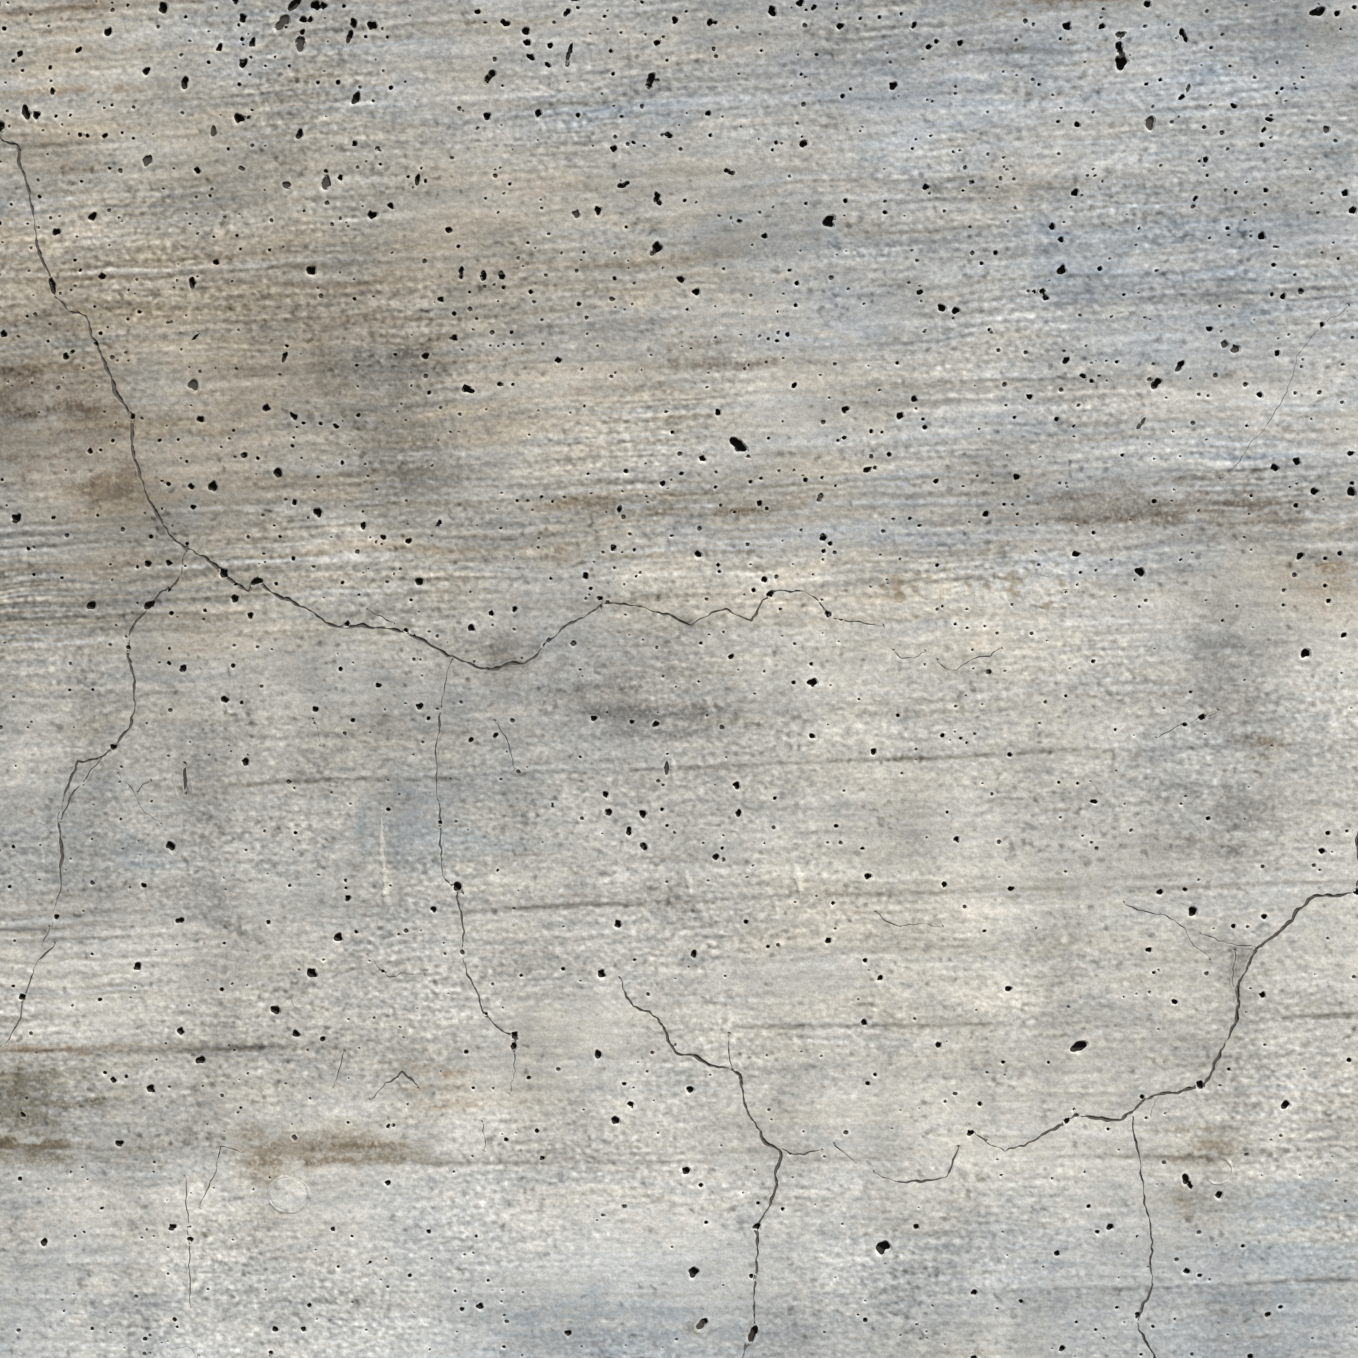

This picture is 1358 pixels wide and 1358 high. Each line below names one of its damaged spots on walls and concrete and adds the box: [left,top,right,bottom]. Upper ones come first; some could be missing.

crack [0,132,1002,1096]
crack [370,1068,421,1102]
crack [182,1143,243,1308]
crack [172,1344,200,1358]